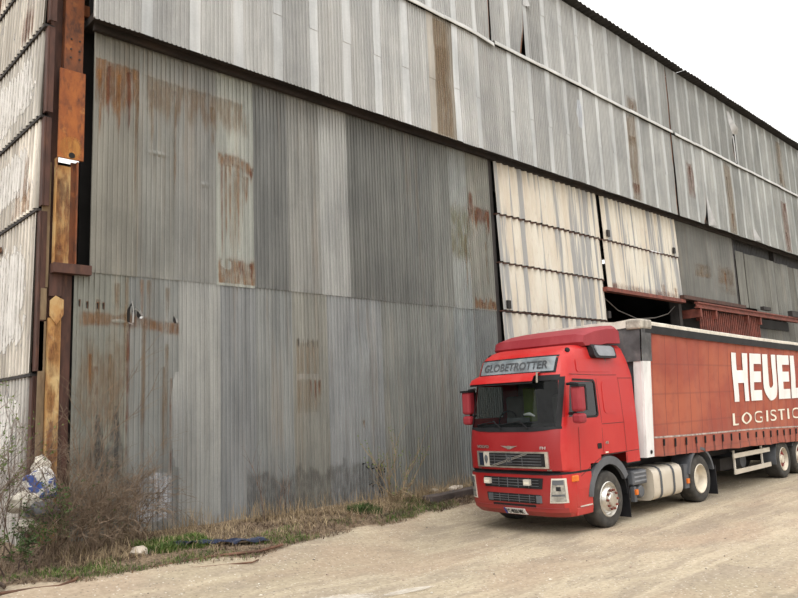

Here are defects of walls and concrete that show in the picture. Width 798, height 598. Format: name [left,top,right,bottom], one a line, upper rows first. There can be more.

corrosion [97,58,139,126]
corrosion [63,139,80,159]